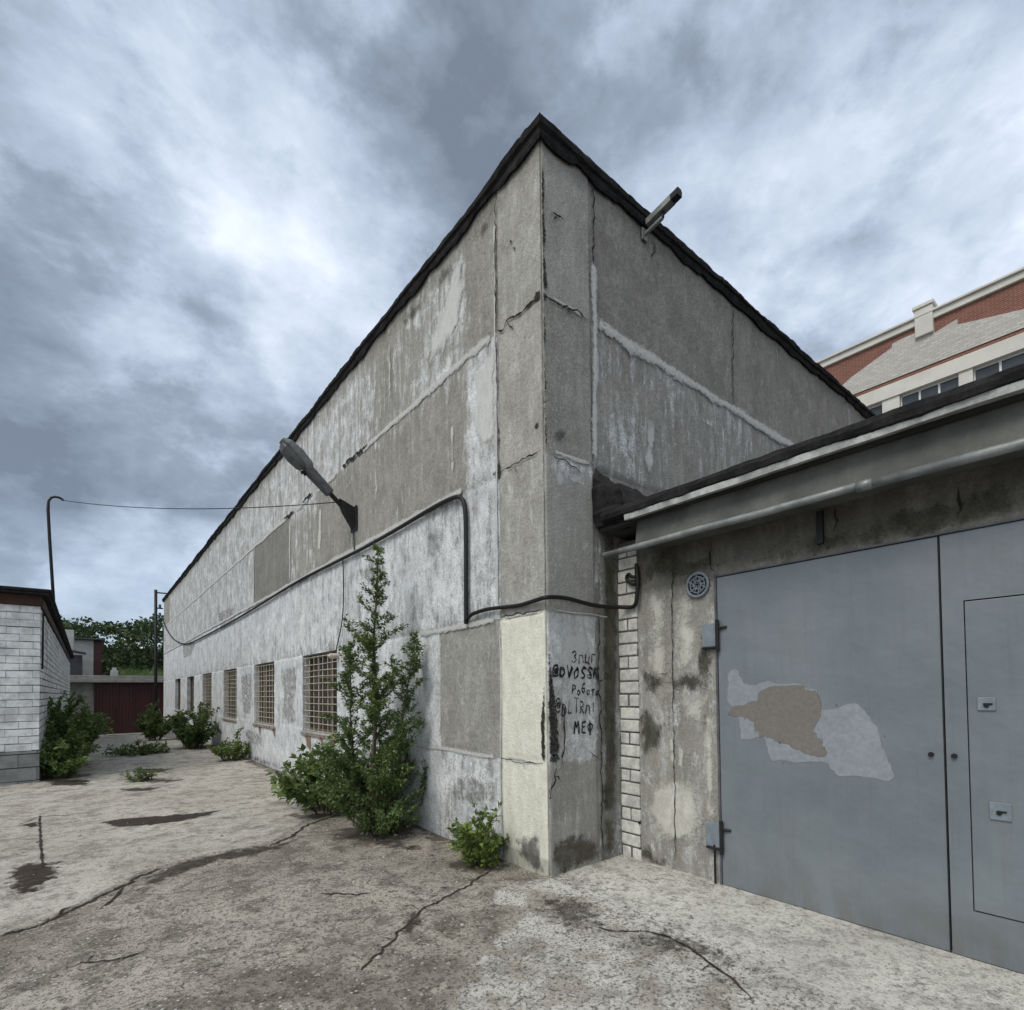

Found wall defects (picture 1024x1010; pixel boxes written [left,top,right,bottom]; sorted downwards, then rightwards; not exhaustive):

crack [494,206,594,474]
crack [729,309,737,403]
leakage [861,485,1012,543]
leakage [520,836,540,869]
leakage [554,535,617,873]
crack [661,562,681,859]
leakage [640,552,718,842]
peeling [727,668,894,781]